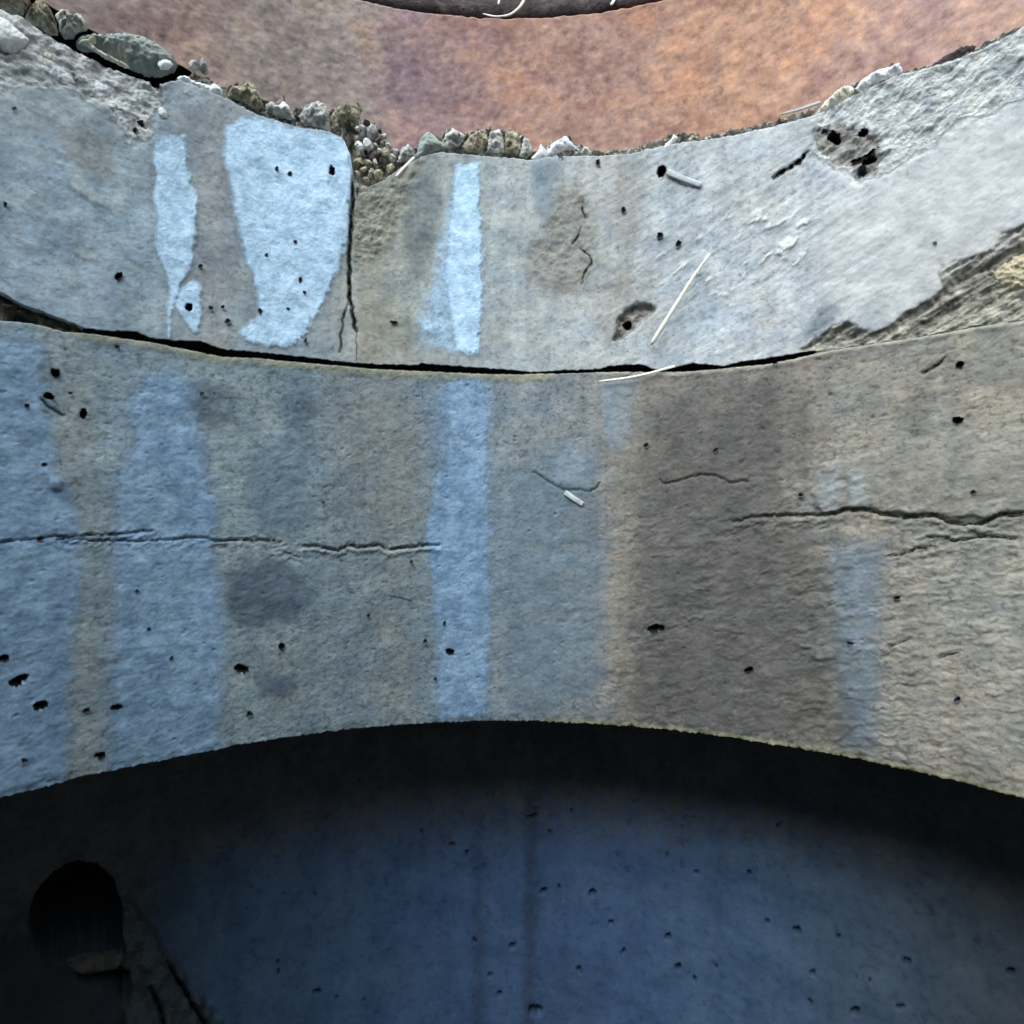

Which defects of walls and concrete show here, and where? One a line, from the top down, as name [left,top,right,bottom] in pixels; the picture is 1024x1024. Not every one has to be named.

efflorescence [152,134,202,337]
efflorescence [224,117,353,347]
crack [83,184,817,375]
efflorescence [419,162,485,355]
spalling [0,9,1024,266]
spalling [799,225,1024,351]
damp [112,372,308,770]
crack [4,531,439,556]
efflorescence [428,378,490,718]
crack [734,508,1024,556]